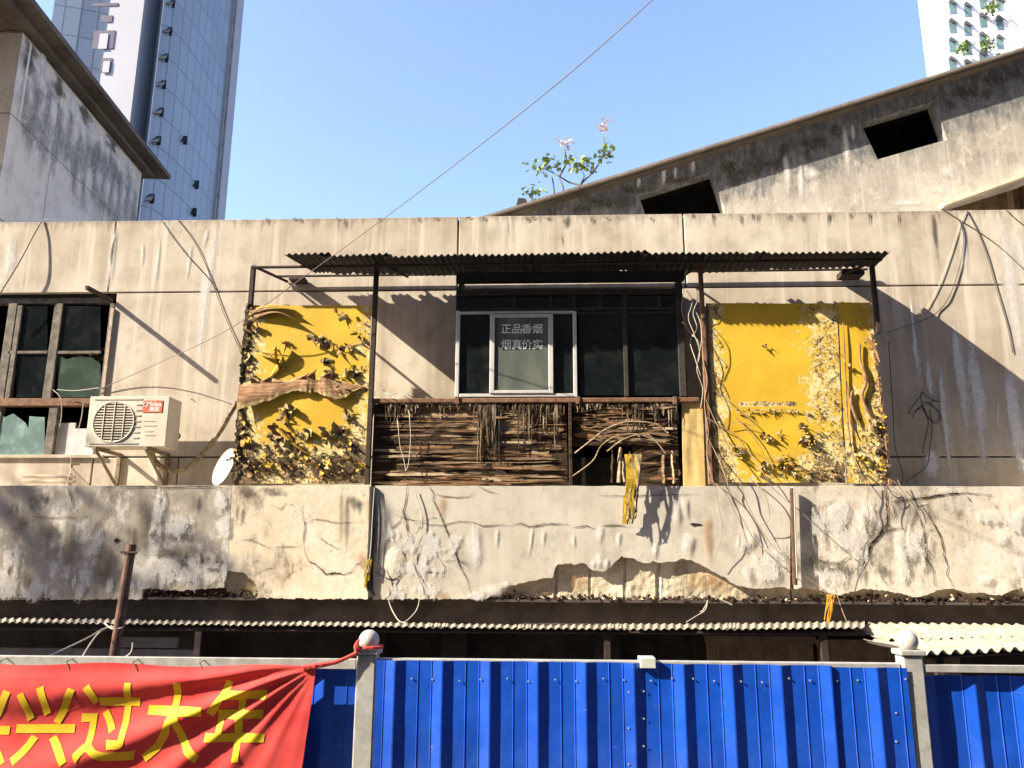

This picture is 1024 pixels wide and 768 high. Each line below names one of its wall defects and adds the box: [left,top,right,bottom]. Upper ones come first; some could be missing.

water stain [23,40,136,221]
water stain [720,126,855,196]
peeling [244,313,257,374]
peeling [306,308,366,389]
peeling [229,402,366,482]
peeling [737,330,887,481]
peeling [0,543,61,603]
water stain [127,507,188,566]
peeling [71,487,258,603]
peeling [383,523,461,600]
crack [252,485,632,593]
spalling [466,494,1024,604]